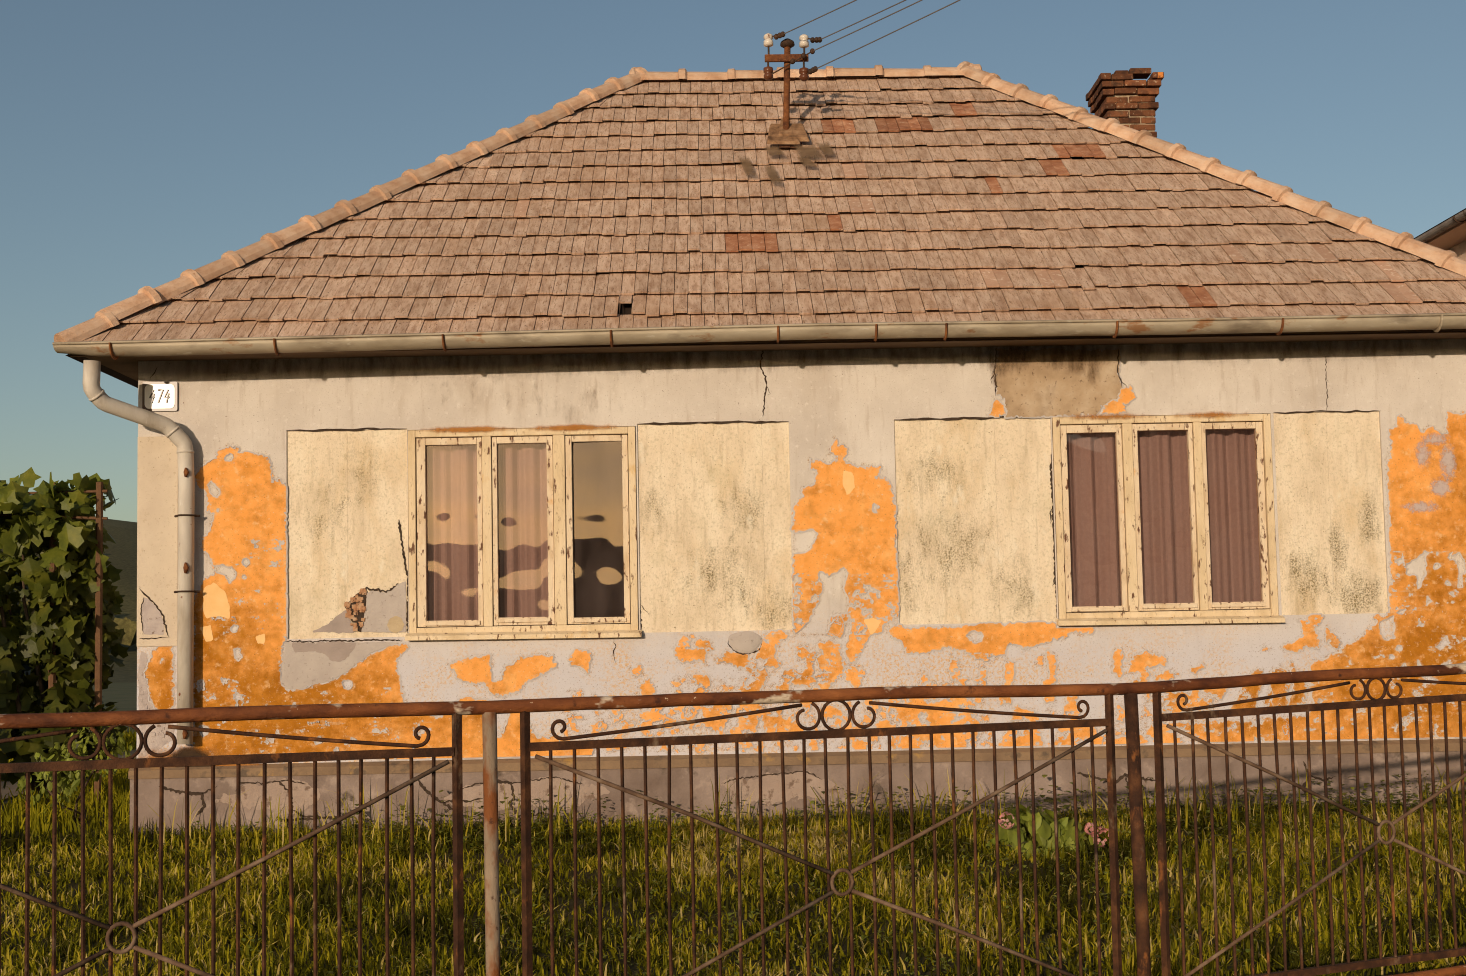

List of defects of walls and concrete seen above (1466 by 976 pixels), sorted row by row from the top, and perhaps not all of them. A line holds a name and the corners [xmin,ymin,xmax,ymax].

crack [641,351,789,425]
peeling [987,346,1137,419]
peeling [137,411,1466,815]